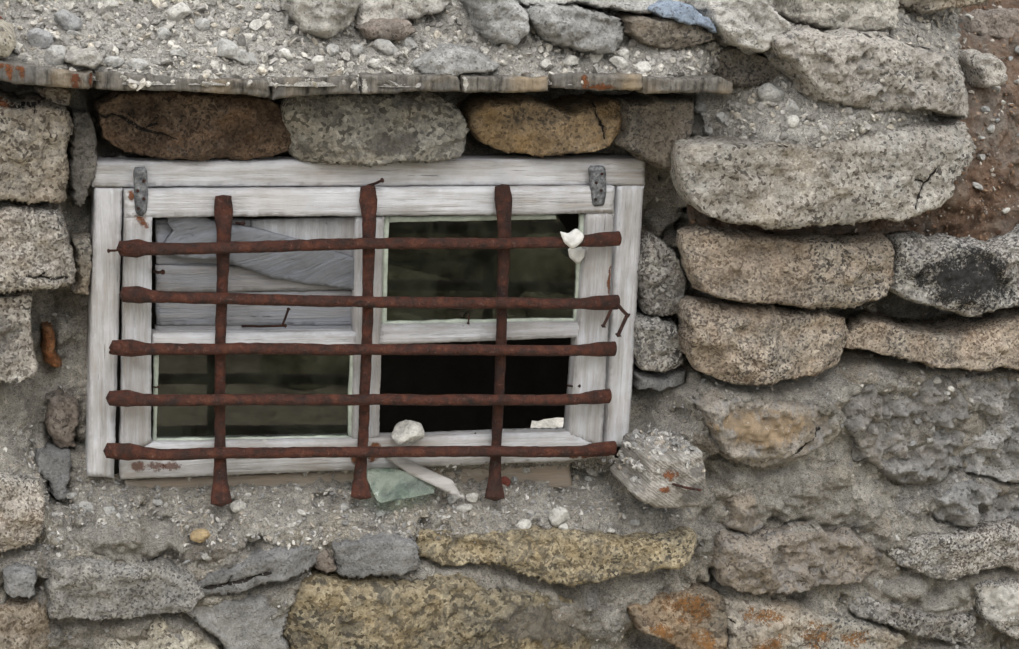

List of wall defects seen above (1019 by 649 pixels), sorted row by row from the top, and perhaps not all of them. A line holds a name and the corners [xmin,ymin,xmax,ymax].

crack [915,167,938,210]
rust [131,461,180,472]